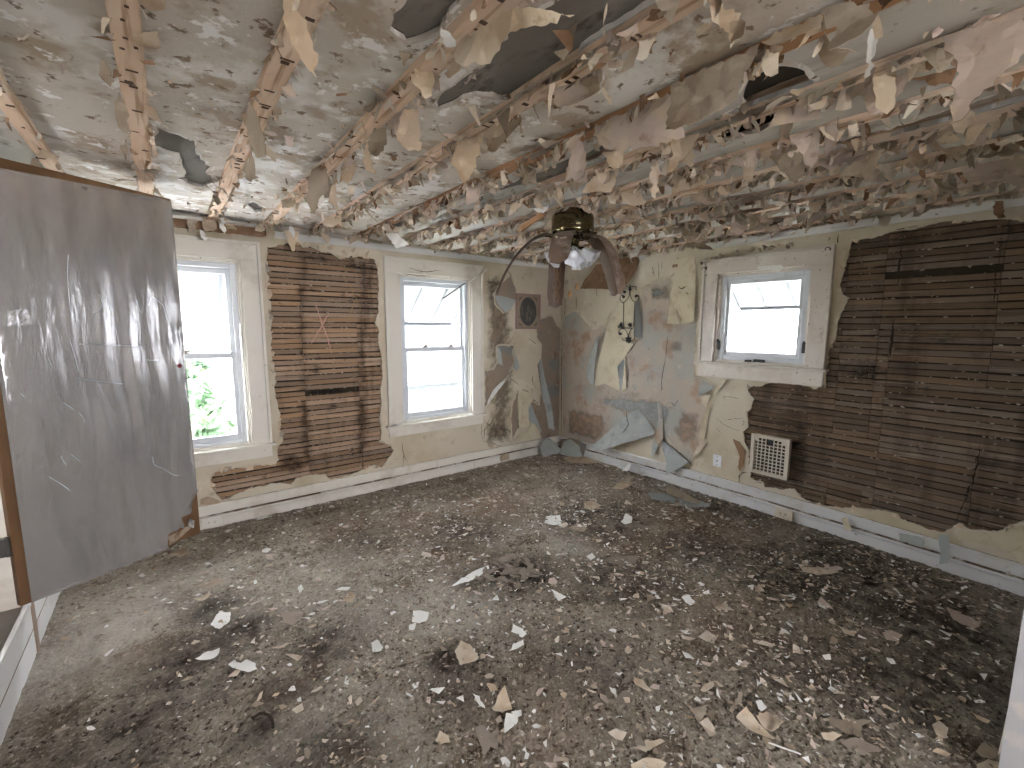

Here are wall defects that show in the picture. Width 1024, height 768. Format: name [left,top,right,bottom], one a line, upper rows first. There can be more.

peeling [90,17,115,41]
flaking render [99,0,1024,532]